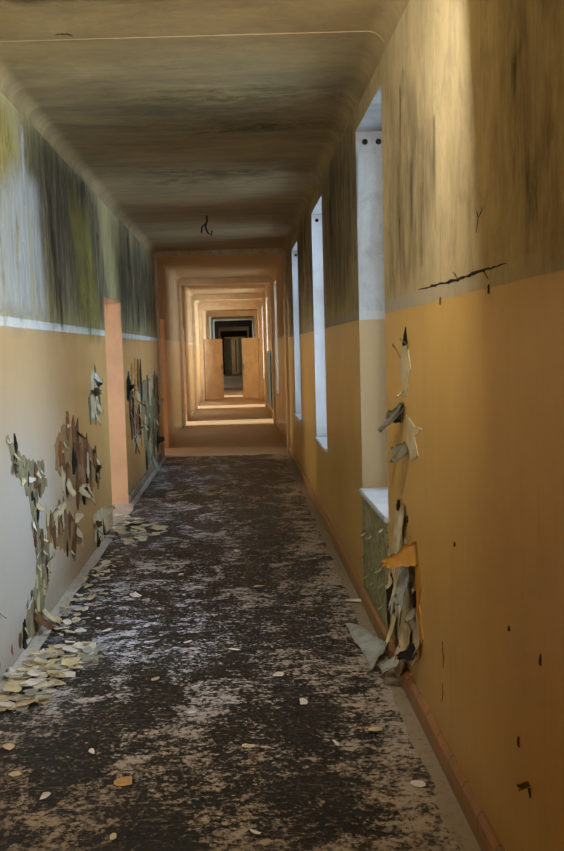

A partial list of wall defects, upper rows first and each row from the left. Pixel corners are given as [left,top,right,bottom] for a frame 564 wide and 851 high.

leakage [0,114,107,316]
crack [418,263,506,290]
peeling [88,363,104,426]
peeling [126,359,165,470]
peeling [377,327,422,463]
peeling [6,411,115,655]
peeling [360,496,424,677]